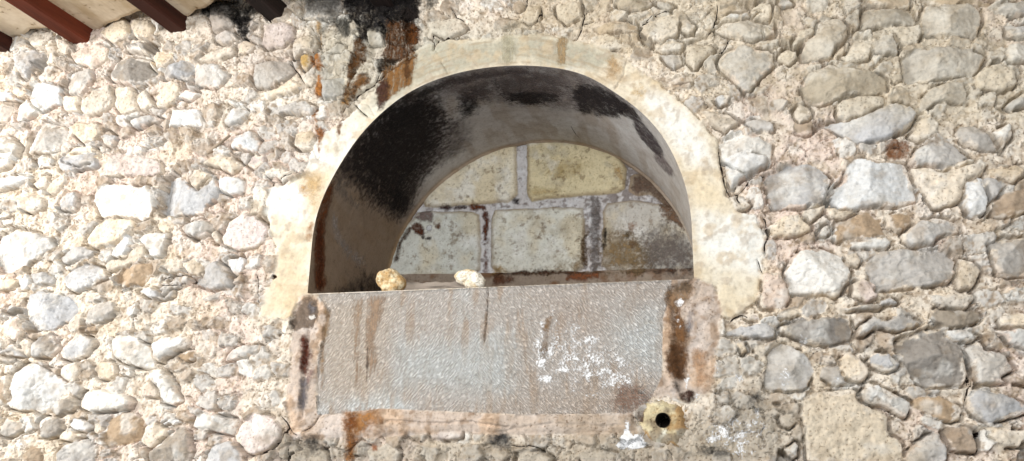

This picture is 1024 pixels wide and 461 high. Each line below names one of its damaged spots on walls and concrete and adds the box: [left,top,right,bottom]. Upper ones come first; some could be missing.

corrosion [342,20,421,109]
water stain [416,211,433,231]
water stain [493,175,693,276]
water stain [532,305,643,406]
corrosion [343,411,382,461]